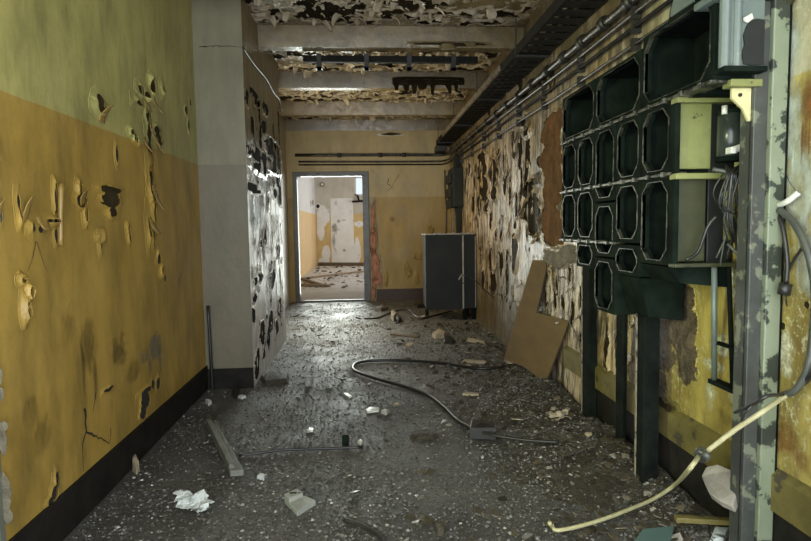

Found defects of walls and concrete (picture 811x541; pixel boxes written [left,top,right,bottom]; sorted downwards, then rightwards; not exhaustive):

peeling [244,0,540,31]
peeling [91,180,132,248]
peeling [244,41,501,381]
flaking render [464,52,581,349]
peeling [659,284,700,412]
crack [82,393,111,469]